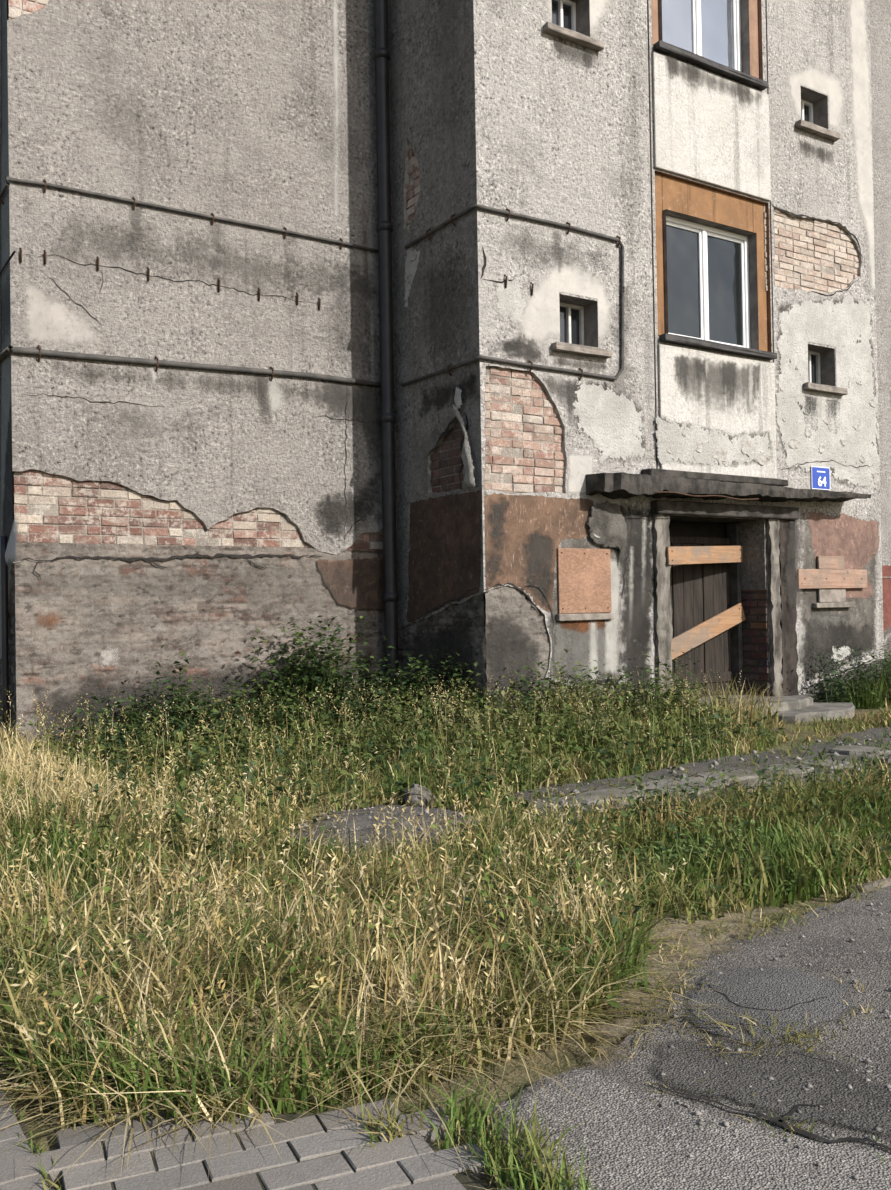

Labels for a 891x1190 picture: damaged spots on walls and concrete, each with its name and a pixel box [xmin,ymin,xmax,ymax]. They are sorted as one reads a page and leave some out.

flaking render [6,0,49,22]
crack [27,254,315,324]
damp [676,356,760,410]
peeling [402,202,891,681]
flaking render [12,469,384,612]
damp [316,480,379,535]
crack [654,1083,891,1151]